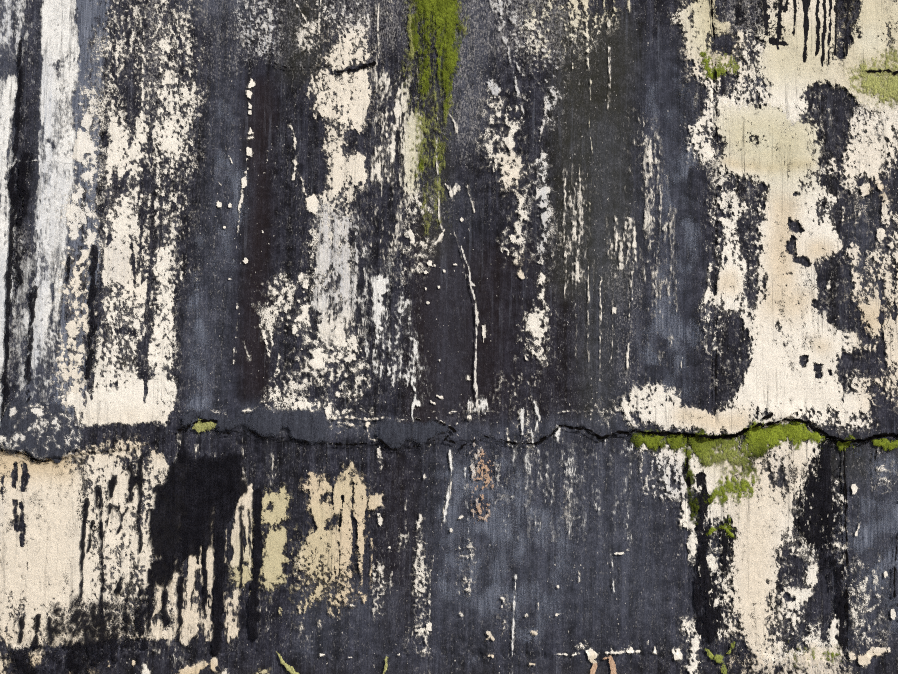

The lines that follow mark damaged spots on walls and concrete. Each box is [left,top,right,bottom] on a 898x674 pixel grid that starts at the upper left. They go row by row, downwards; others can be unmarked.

spalling [0,0,384,674]
crack [177,419,307,442]
peeling [242,0,458,469]
peeling [412,543,431,639]
peeling [475,0,617,366]
crack [329,246,898,659]
crack [710,0,719,154]
peeling [590,0,898,435]
damp [625,429,898,671]
damp [725,0,862,66]
peeling [730,469,896,674]
crack [866,68,898,76]